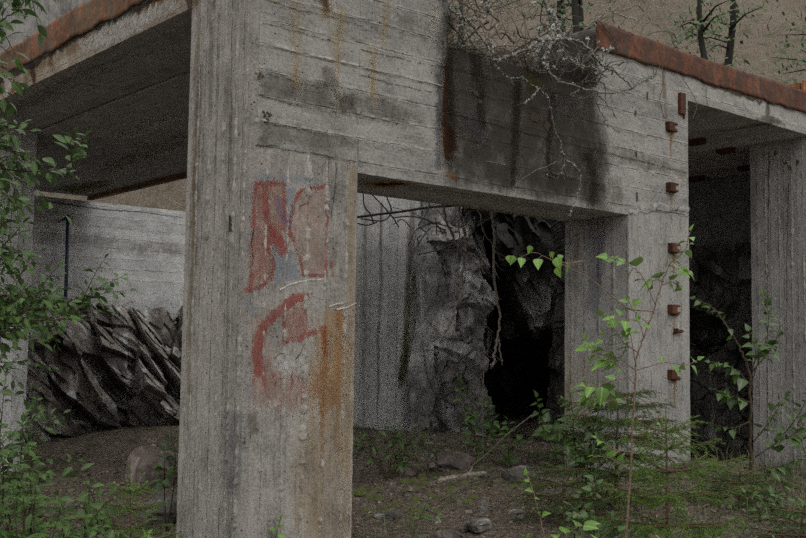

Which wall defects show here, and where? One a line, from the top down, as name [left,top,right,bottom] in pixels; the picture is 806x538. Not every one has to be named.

damp [440,35,604,203]